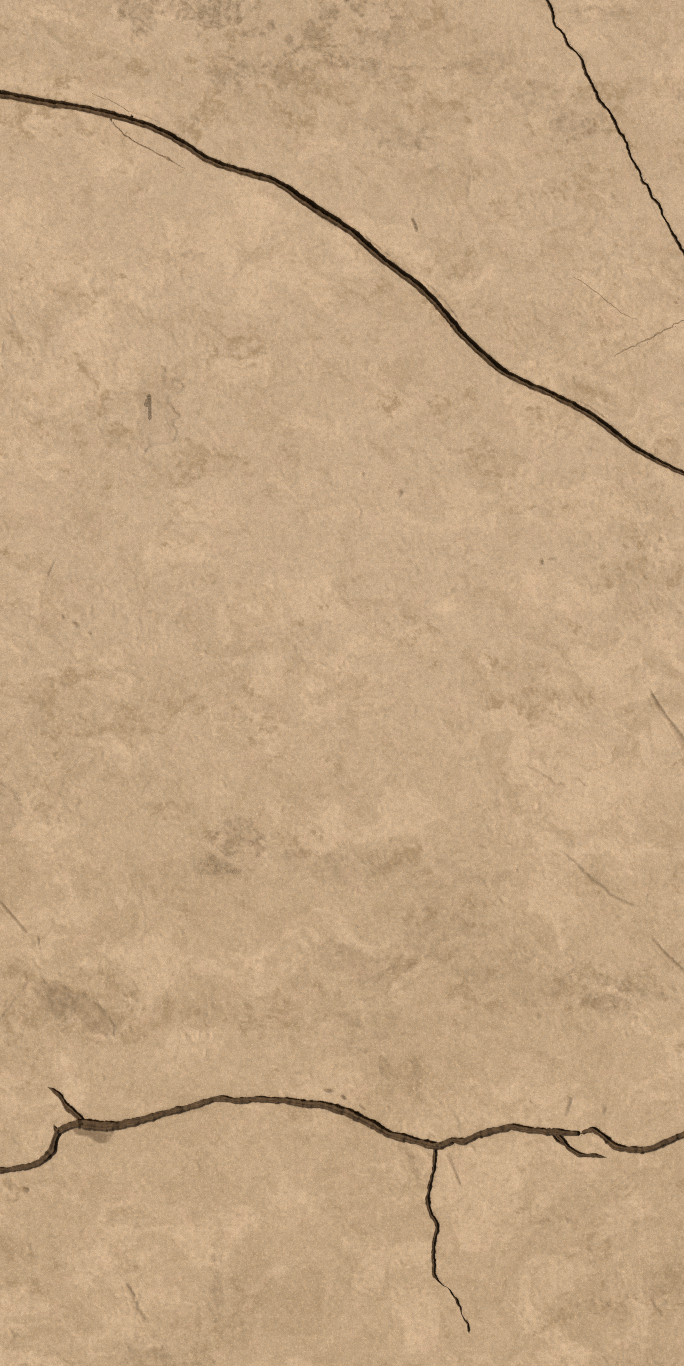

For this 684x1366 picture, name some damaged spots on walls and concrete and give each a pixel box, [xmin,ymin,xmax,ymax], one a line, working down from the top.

crack [546,0,684,256]
crack [0,90,684,476]
crack [0,1087,684,1333]